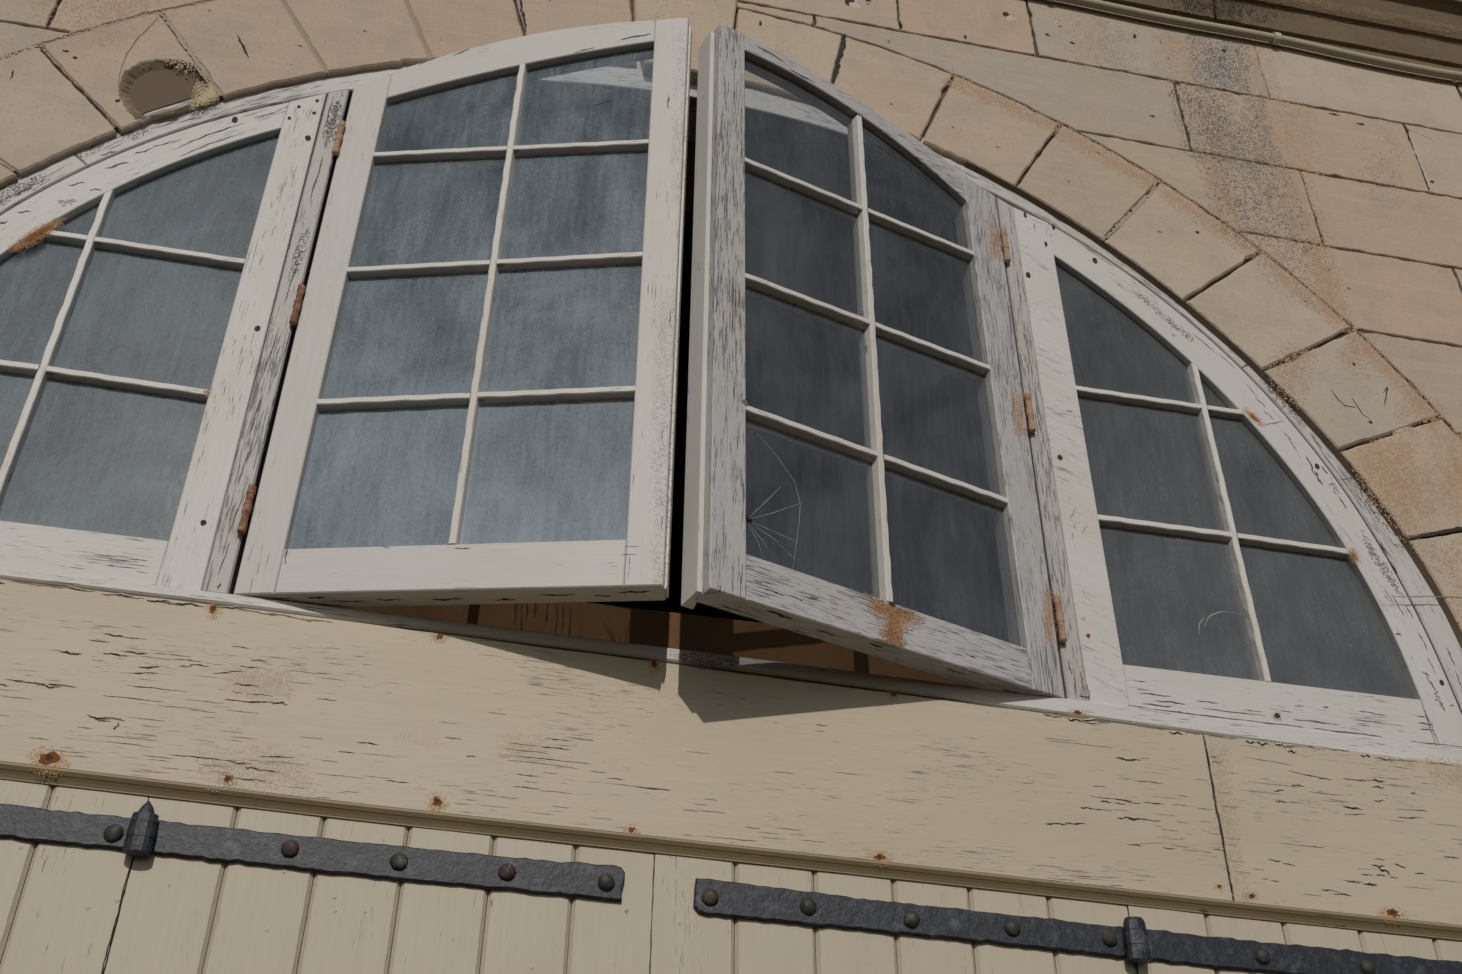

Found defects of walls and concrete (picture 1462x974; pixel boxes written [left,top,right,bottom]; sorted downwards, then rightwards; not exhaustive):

spalling [182,80,223,122]
peeling [53,395,263,611]
rust [864,592,925,647]
peeling [102,633,158,674]
peeling [179,664,288,705]
peeling [86,714,125,730]
rust [26,746,72,778]
peeling [1044,799,1158,825]